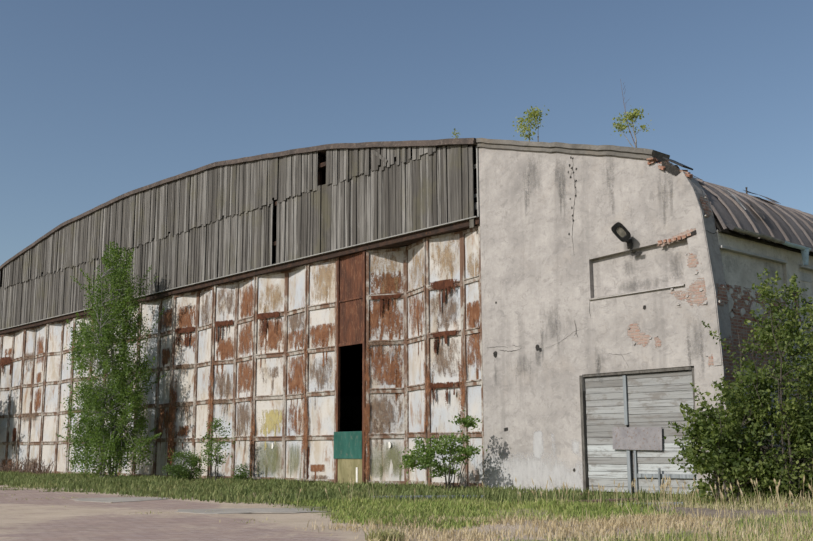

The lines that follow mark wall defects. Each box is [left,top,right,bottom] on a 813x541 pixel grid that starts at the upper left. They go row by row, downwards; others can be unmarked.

spalling [647,157,693,178]
flaking render [700,195,714,218]
spalling [657,228,697,247]
corrosion [314,265,332,310]
spalling [627,321,661,347]
flaking render [671,253,801,393]
corrosion [0,337,44,423]
corrosion [158,285,335,479]
corrosion [364,241,481,480]